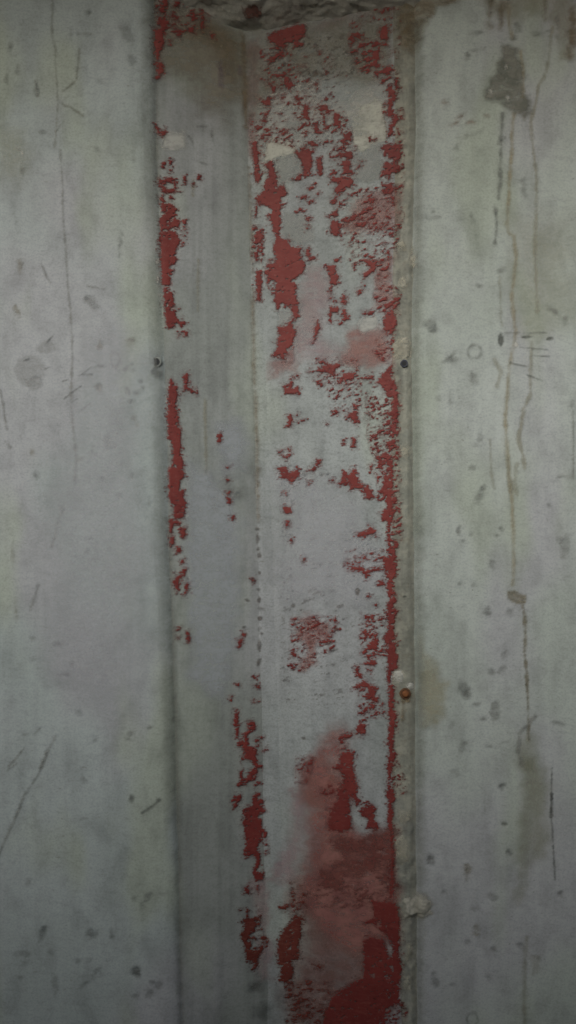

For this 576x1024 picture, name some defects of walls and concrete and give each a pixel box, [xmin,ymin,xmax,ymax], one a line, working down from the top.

peeling [149,0,218,79]
peeling [153,157,202,337]
peeling [164,373,198,595]
peeling [227,7,408,1024]